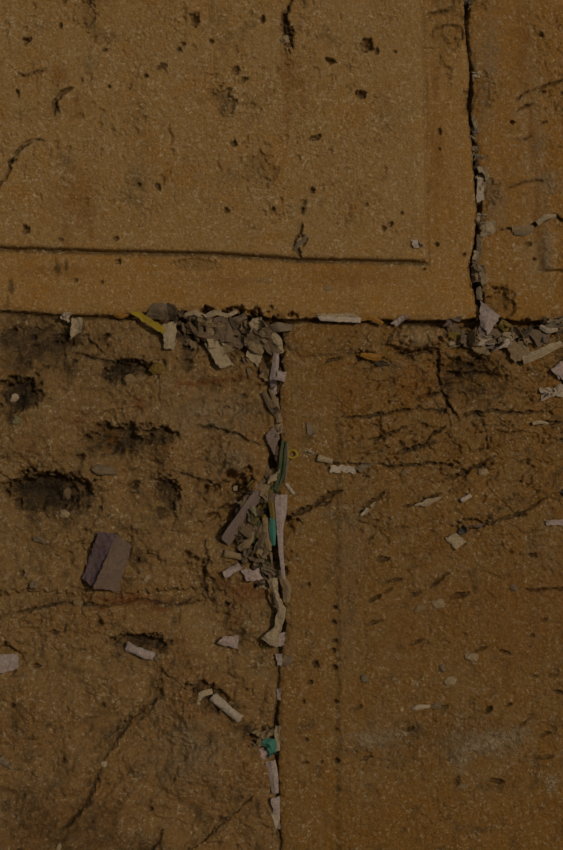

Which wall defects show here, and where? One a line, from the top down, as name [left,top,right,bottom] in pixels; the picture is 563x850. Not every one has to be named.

crack [520,81,563,109]
crack [0,139,46,186]
crack [278,352,286,386]
crack [346,348,563,508]
crack [289,490,343,518]
crack [360,491,386,513]
crack [483,498,547,527]
crack [17,540,213,613]
crack [525,586,563,594]
crack [58,667,164,835]